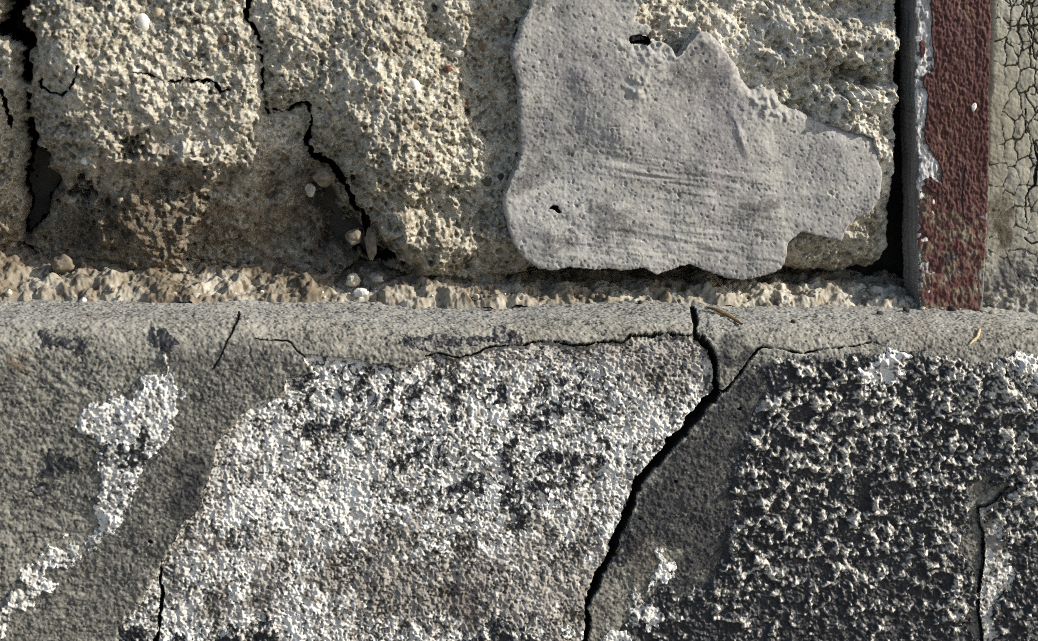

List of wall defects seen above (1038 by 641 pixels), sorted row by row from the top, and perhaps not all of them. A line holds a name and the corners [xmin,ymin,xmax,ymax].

crack [0,0,79,234]
crack [133,72,230,93]
crack [243,0,405,265]
peeling [917,0,992,311]
crack [212,311,305,370]
peeling [31,448,80,496]
peeling [85,426,161,552]
spalling [118,324,713,641]
crack [425,306,869,641]
peeling [979,493,1016,641]
crack [977,482,1019,641]